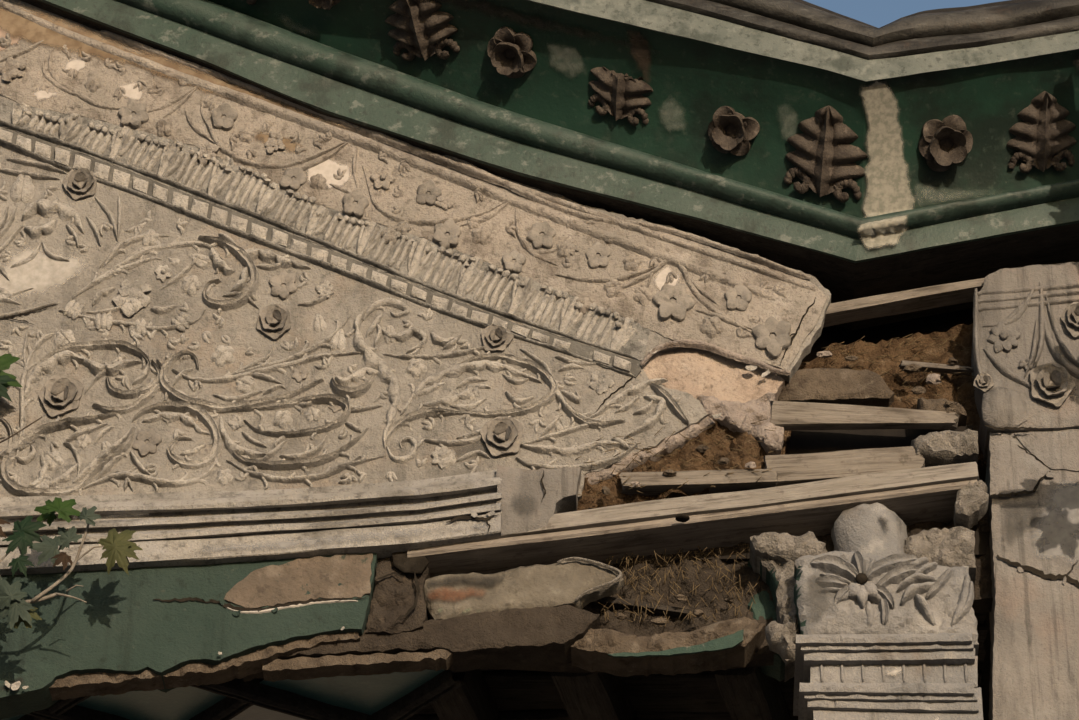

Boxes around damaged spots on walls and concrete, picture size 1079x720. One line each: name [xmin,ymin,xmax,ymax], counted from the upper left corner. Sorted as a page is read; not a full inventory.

peeling [858,80,948,248]
spalling [584,339,791,485]
crack [991,445,1051,497]
spalling [756,556,798,627]
crack [997,555,1079,588]